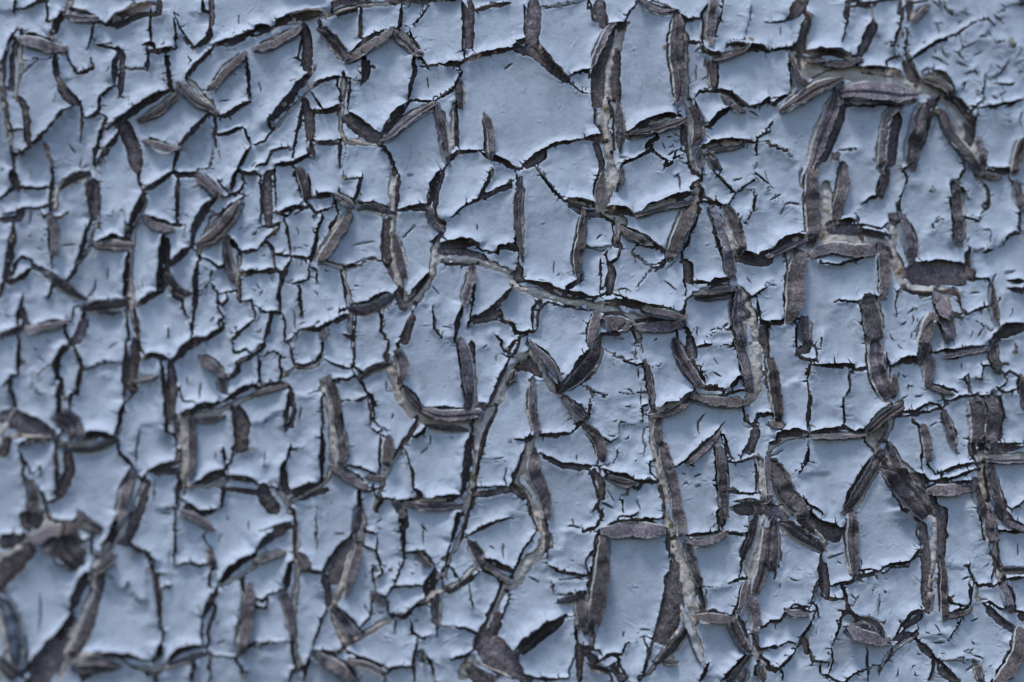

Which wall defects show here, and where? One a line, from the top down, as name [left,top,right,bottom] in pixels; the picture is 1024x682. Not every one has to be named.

crack [681,0,995,129]
crack [919,70,953,151]
crack [964,80,1024,146]
peeling [0,0,353,682]
crack [0,0,806,682]
peeling [272,0,1024,682]
crack [816,103,1014,301]
crack [894,283,992,333]
crack [983,205,1021,254]
crack [1006,278,1024,295]
crack [665,299,1024,682]